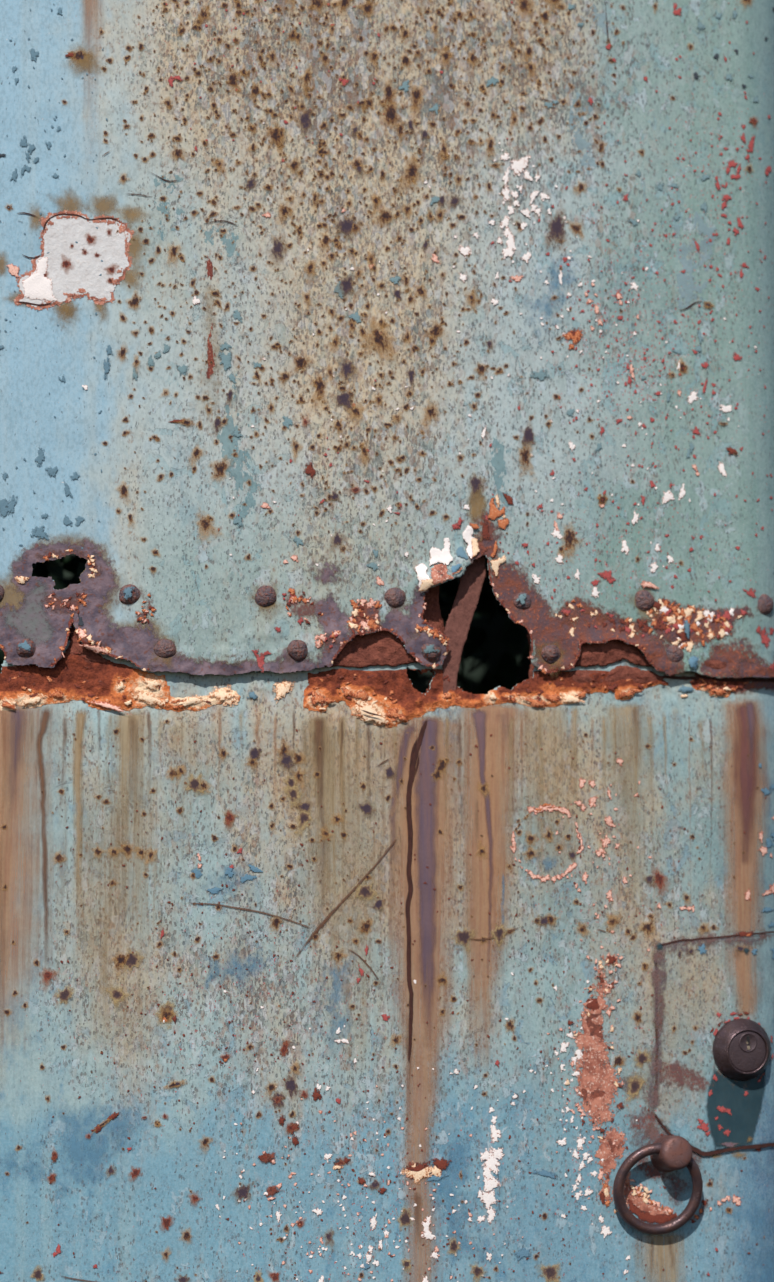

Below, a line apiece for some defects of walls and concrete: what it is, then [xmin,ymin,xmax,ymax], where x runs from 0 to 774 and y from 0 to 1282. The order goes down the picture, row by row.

peeling [0,175,186,313]
rust [65,0,624,533]
peeling [458,153,552,283]
peeling [421,1107,505,1259]